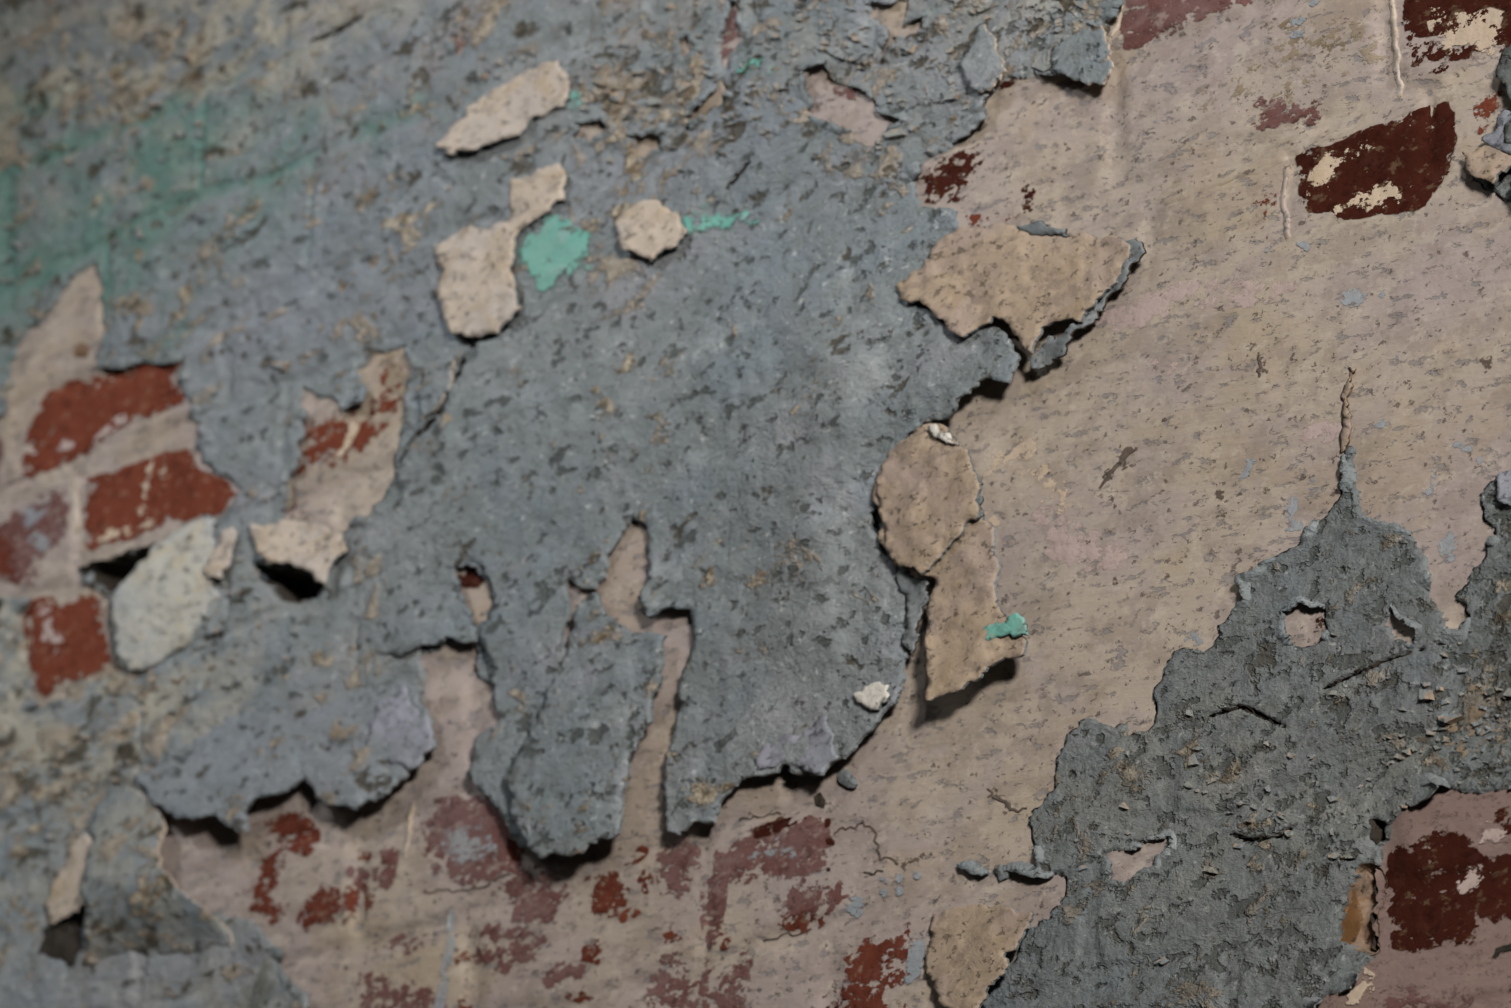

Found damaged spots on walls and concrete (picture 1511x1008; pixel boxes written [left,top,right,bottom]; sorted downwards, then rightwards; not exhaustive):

peeling [435,0,754,161]
peeling [792,54,913,147]
peeling [614,200,689,262]
peeling [0,163,568,714]
peeling [838,0,1511,888]
peeling [38,520,1066,1008]
crack [1209,705,1284,728]
crack [1322,642,1446,689]
peeling [1295,773,1511,1008]